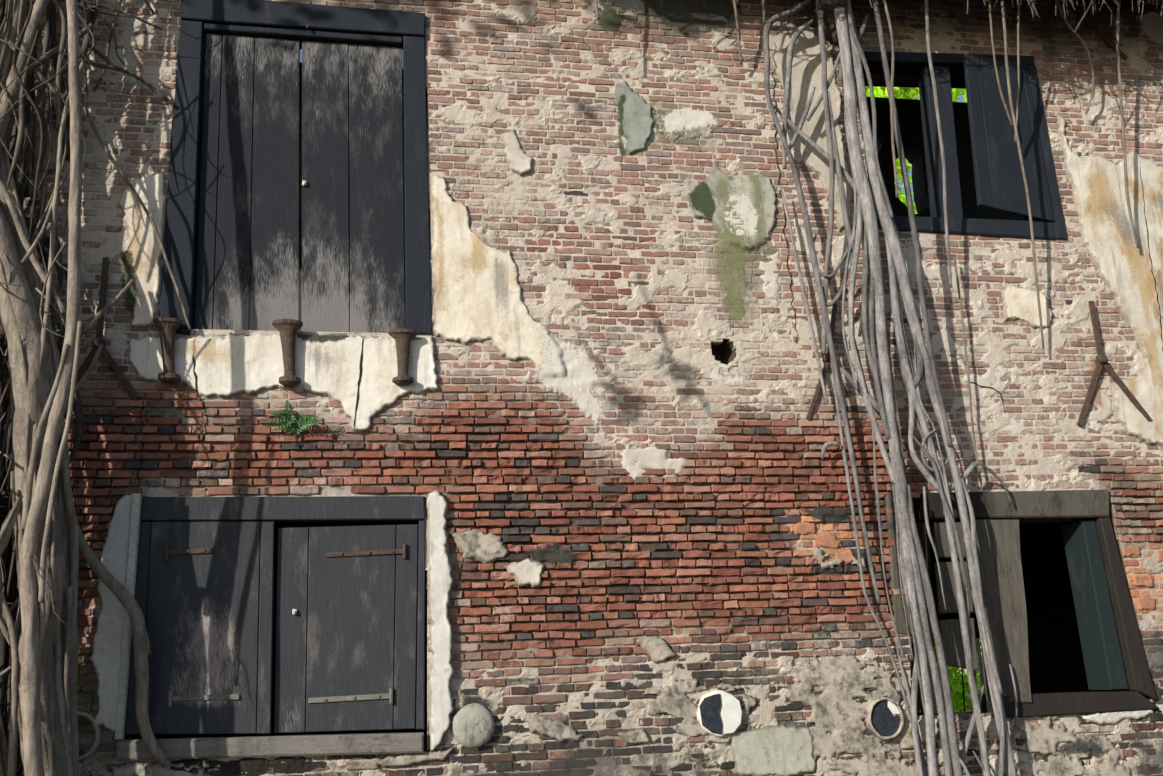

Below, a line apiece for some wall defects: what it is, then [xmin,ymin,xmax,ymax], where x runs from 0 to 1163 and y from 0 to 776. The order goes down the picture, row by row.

water stain [594,0,742,37]
flaking render [614,81,718,156]
crack [1140,167,1163,350]
flaking render [118,172,607,434]
crack [354,338,364,428]
spalling [709,339,745,385]
spalling [793,522,855,565]
spalling [637,636,676,663]
spalling [527,716,584,742]
spalling [642,653,939,776]
spalling [1007,710,1163,776]